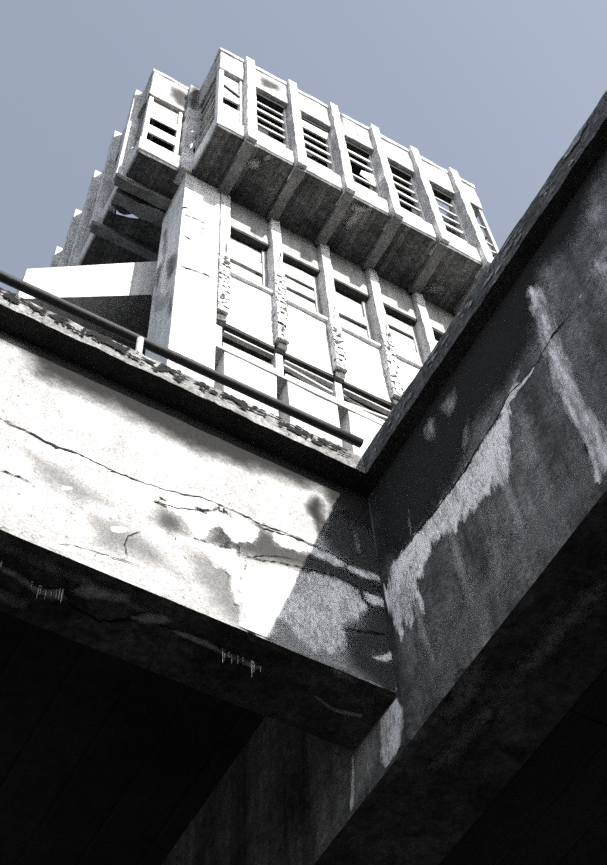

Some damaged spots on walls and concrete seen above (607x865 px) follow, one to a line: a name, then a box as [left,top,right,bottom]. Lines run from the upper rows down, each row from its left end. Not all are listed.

crack [0,315,569,589]
damp [0,148,607,810]